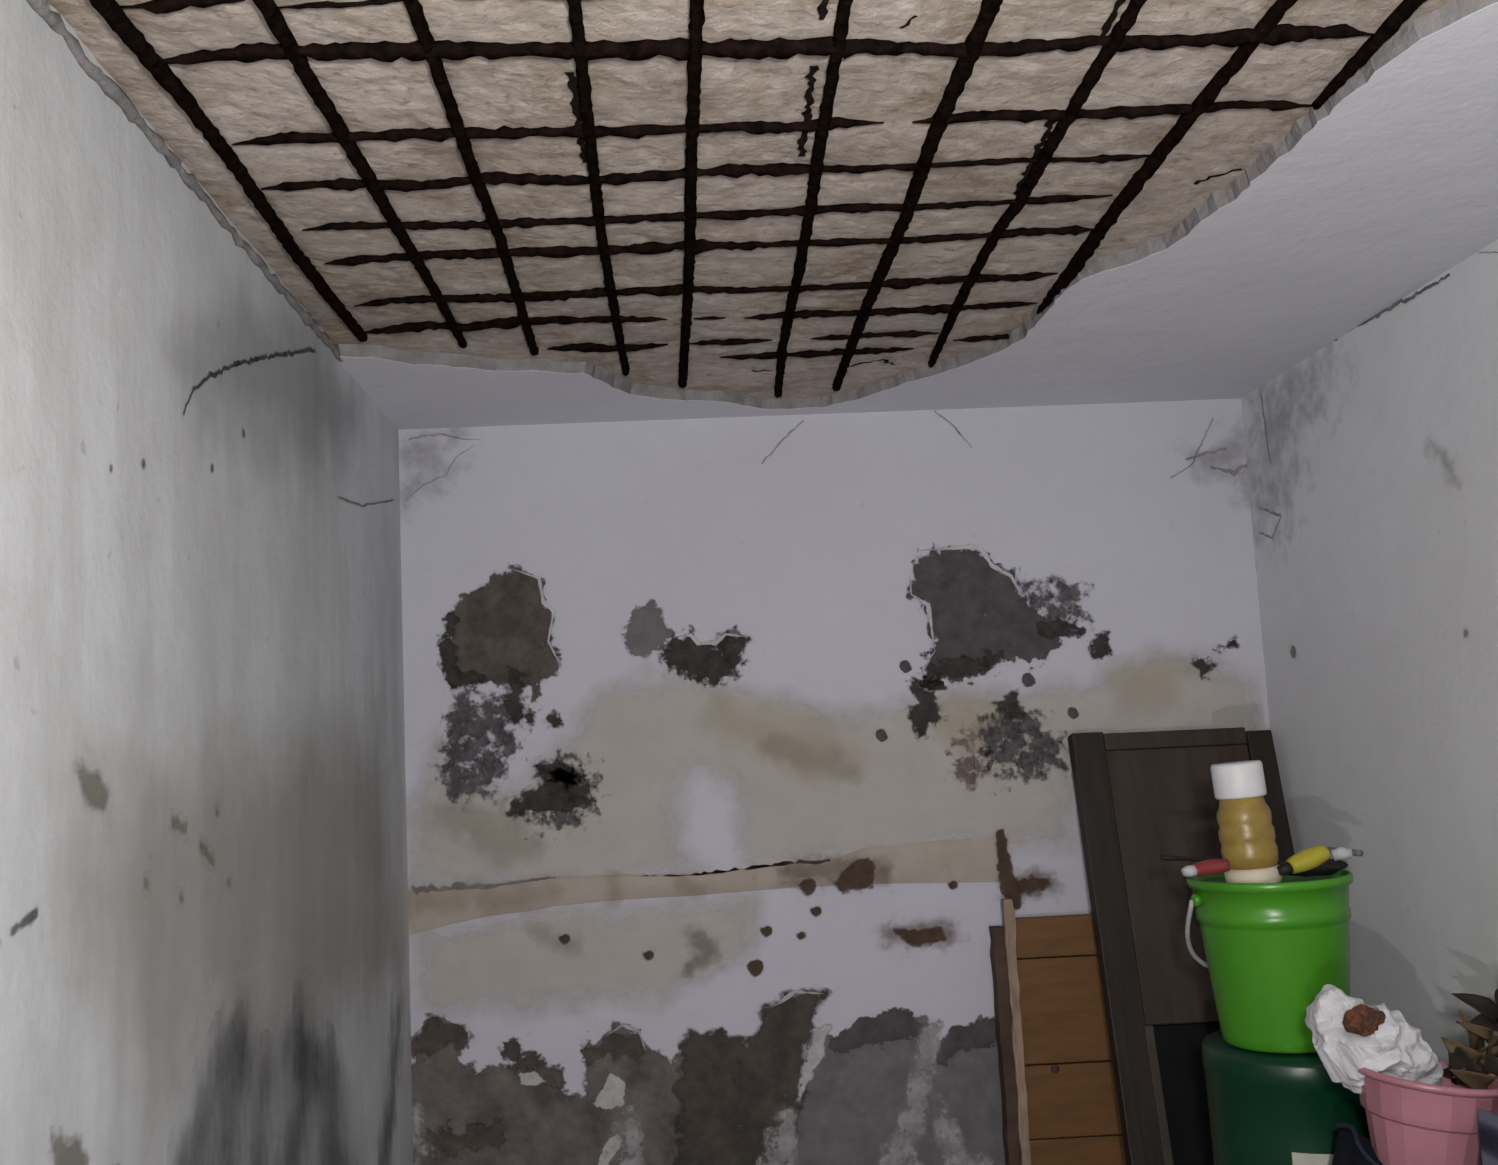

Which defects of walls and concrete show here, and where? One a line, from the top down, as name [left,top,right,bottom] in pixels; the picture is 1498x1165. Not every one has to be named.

spalling [26,0,1498,409]
crack [1324,251,1498,347]
crack [183,347,315,415]
crack [1259,507,1282,539]
peeling [436,565,564,803]
peeling [624,599,751,687]
peeling [899,544,1113,791]
peeling [1192,640,1239,679]
damp [417,664,1254,884]
peeling [875,729,888,742]
damp [426,903,752,1003]
peeling [411,988,1005,1165]